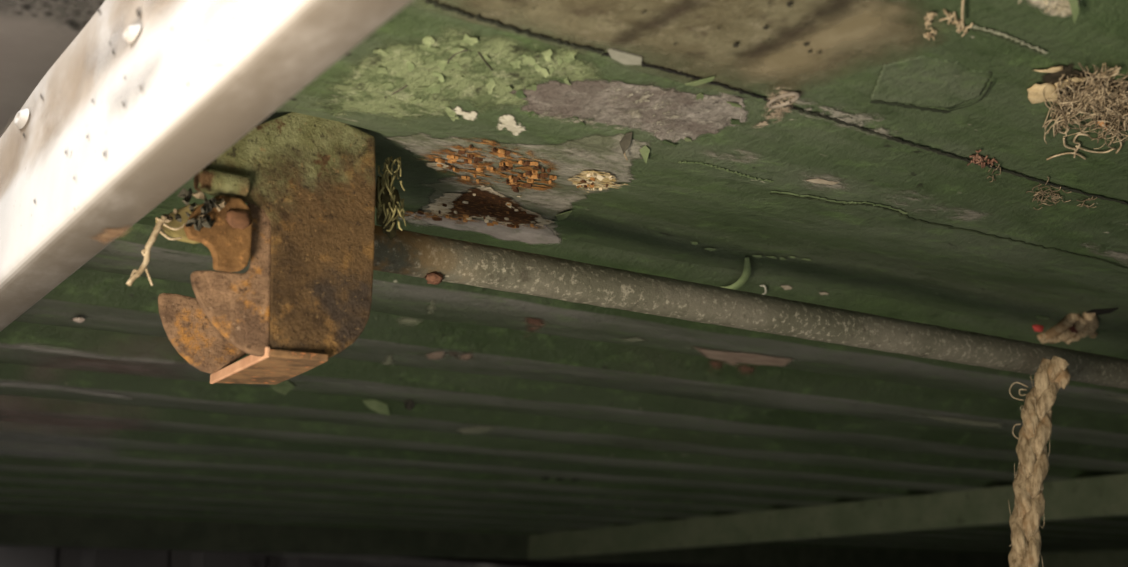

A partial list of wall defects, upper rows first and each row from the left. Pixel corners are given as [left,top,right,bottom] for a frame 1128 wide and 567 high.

crack [425,0,611,58]
peeling [318,29,748,160]
damp [457,0,924,89]
crack [641,62,1128,205]
crack [939,19,1048,55]
peeling [1018,0,1079,24]
corrosion [386,133,650,244]
crack [678,161,1128,269]